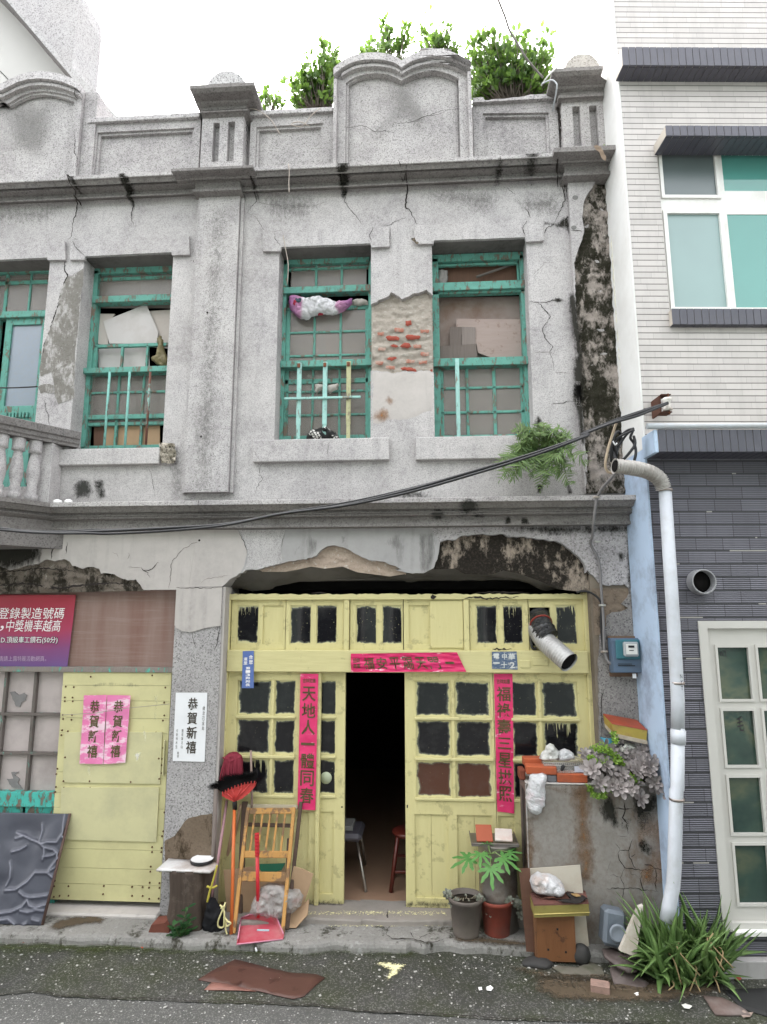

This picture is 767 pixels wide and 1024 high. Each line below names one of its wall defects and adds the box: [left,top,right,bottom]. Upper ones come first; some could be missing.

crack [346,109,455,133]
crack [244,123,416,246]
crack [43,135,82,352]
flaking render [38,268,84,404]
flaking render [371,293,433,373]
crack [532,300,564,373]
spalling [0,560,145,594]
spalling [260,546,406,576]
spalling [434,534,629,635]
flaking render [165,814,212,861]
leakage [600,795,657,828]
crack [603,801,661,903]